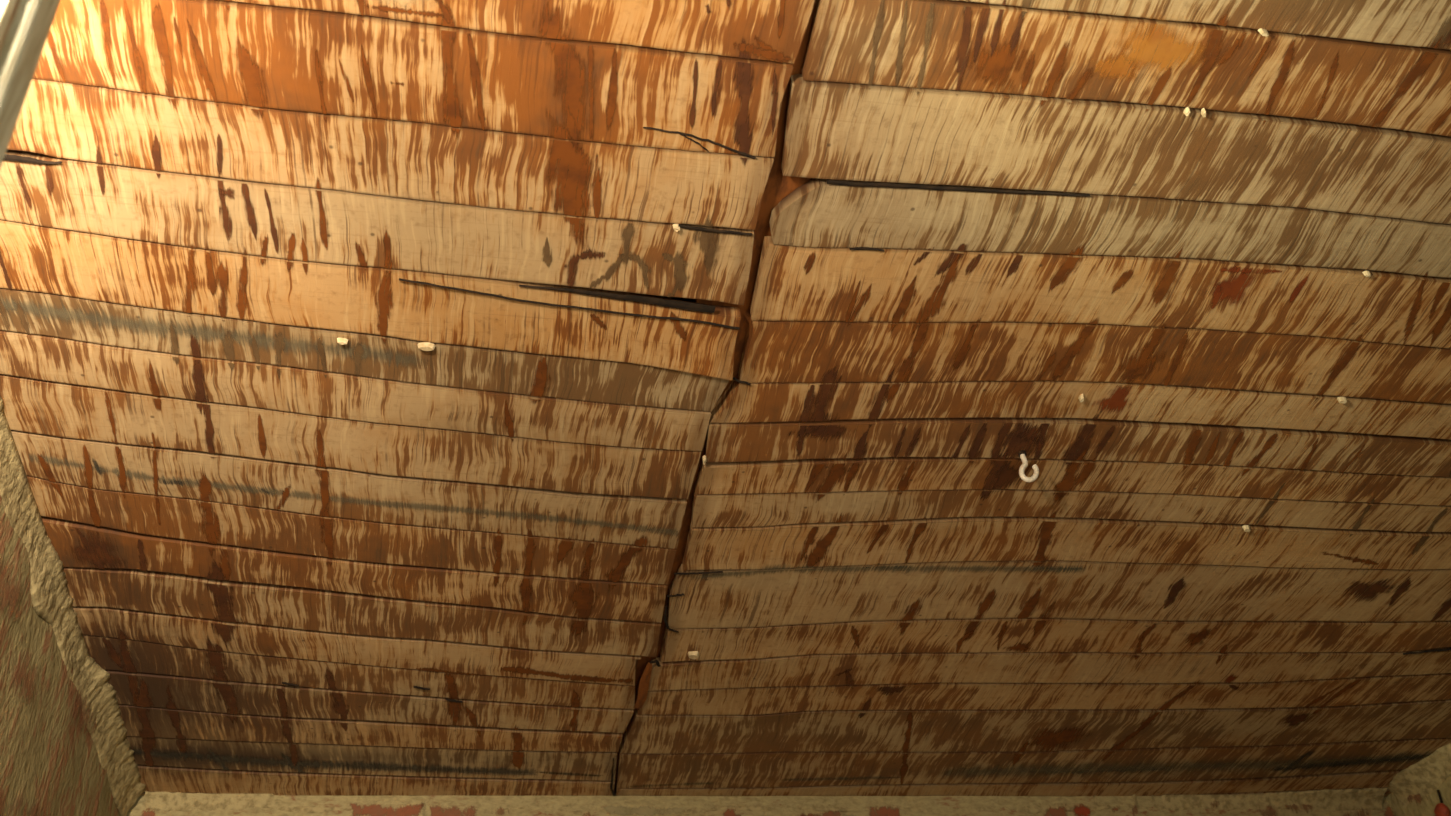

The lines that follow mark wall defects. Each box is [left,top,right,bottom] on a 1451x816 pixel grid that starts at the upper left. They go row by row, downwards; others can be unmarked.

crack [643,127,756,159]
crack [399,278,740,330]
leakage [0,299,416,380]
crack [664,571,723,633]
crack [1403,647,1451,655]
crack [609,758,617,796]
spalling [350,802,476,816]
spalling [870,806,900,816]
spalling [1045,804,1090,816]